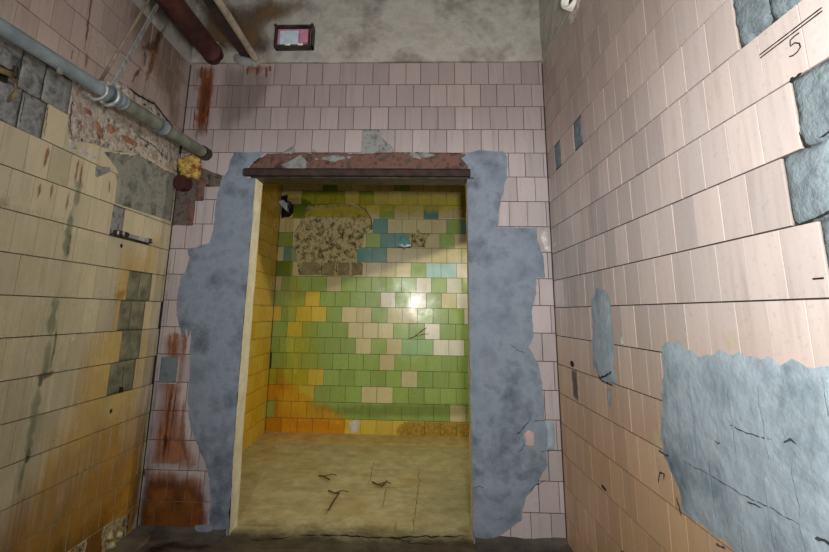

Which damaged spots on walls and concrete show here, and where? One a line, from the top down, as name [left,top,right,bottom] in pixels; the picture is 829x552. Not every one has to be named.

peeling [733,0,802,46]
spalling [0,36,180,177]
rust [193,67,212,134]
peeling [173,168,222,226]
spalling [279,195,294,218]
spalling [293,203,373,276]
peeling [784,60,829,267]
peeling [106,271,152,395]
rust [155,384,190,466]
rust [4,431,202,552]